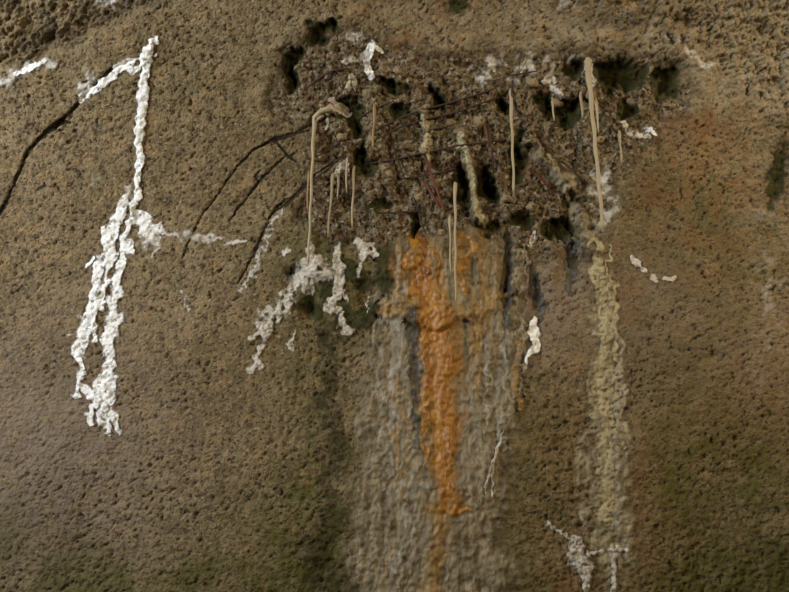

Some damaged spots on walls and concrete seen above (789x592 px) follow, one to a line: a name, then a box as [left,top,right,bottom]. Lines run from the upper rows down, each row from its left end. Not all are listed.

leakage [0,58,57,85]
crack [0,57,140,216]
leakage [68,36,247,436]
crack [181,117,326,259]
leakage [238,208,283,292]
crack [238,161,333,284]
spalling [267,18,696,262]
leakage [630,255,677,283]
leakage [246,238,429,592]
corrosion [389,227,502,592]
leakage [460,231,547,592]
leakage [545,244,635,592]